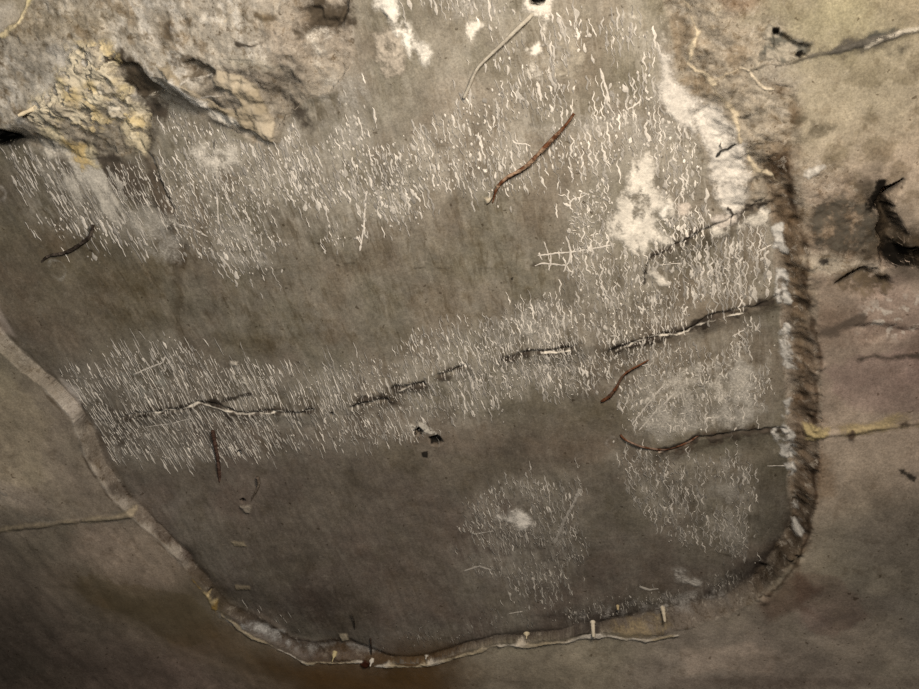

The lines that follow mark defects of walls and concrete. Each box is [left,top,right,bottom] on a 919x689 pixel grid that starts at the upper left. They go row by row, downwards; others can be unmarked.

spalling [0,103,134,157]
spalling [102,48,163,99]
spalling [109,66,275,142]
spalling [190,0,357,136]
spalling [664,0,824,532]
leakage [0,0,775,629]
crack [500,342,574,362]
crack [609,290,784,354]
crack [120,392,315,422]
crack [356,366,464,406]
leakage [220,600,384,666]
leakage [376,617,679,668]